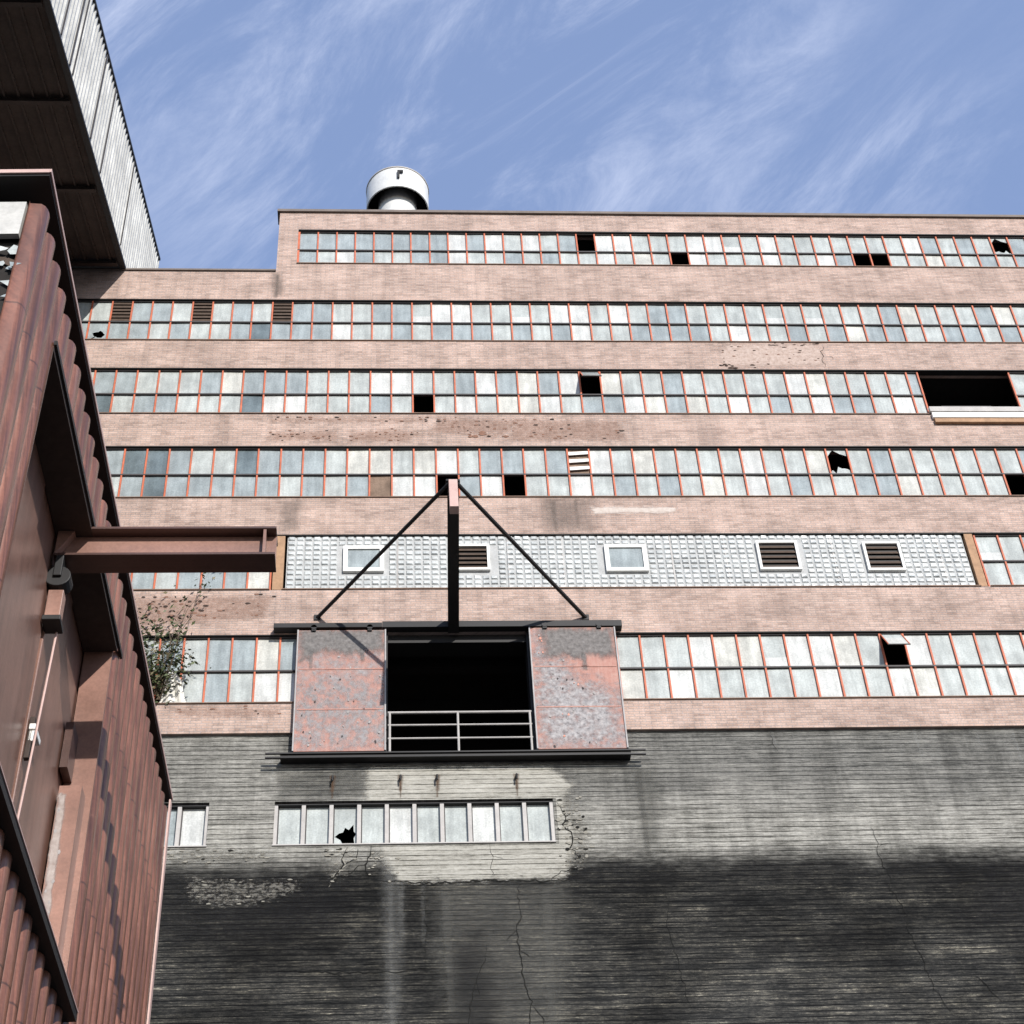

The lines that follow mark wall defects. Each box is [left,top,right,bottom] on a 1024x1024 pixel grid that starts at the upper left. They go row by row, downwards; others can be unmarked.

spalling [719,343,823,369]
spalling [187,879,302,905]
crack [284,807,582,1024]